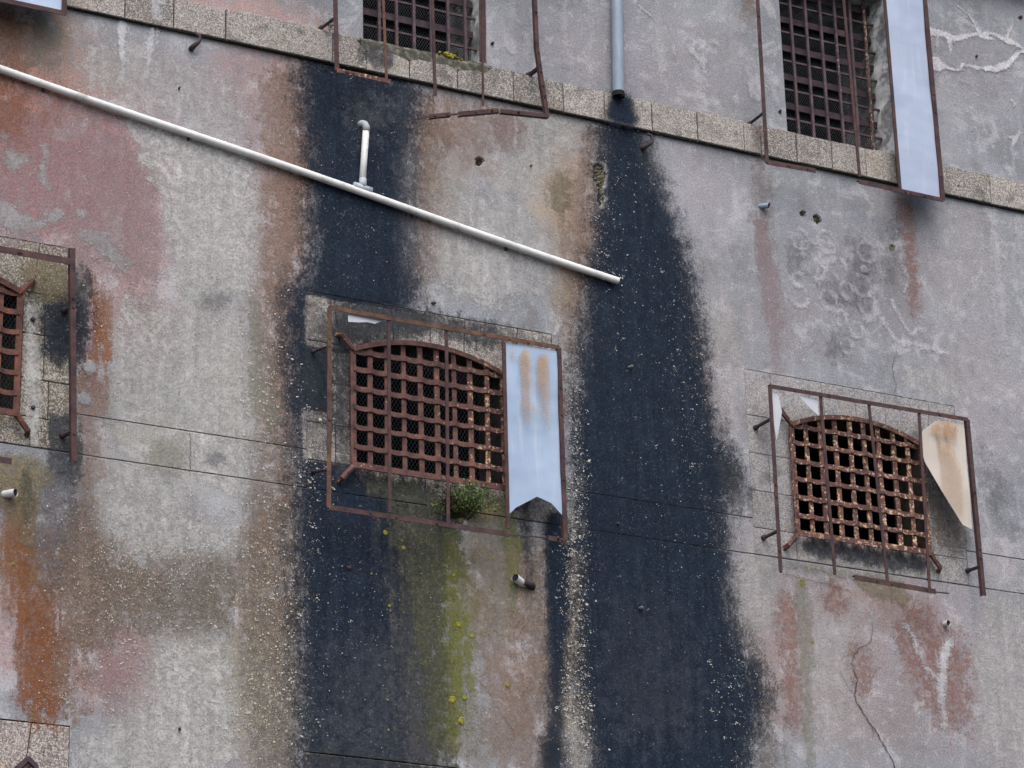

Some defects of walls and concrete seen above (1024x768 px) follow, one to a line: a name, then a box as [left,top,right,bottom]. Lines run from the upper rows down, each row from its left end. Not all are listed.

crack [930,5,1024,72]
crack [1008,99,1021,146]
damp [37,264,101,375]
damp [34,409,86,543]
damp [237,44,496,768]
damp [498,92,778,768]
corrosion [1,540,112,728]
crack [841,617,895,768]